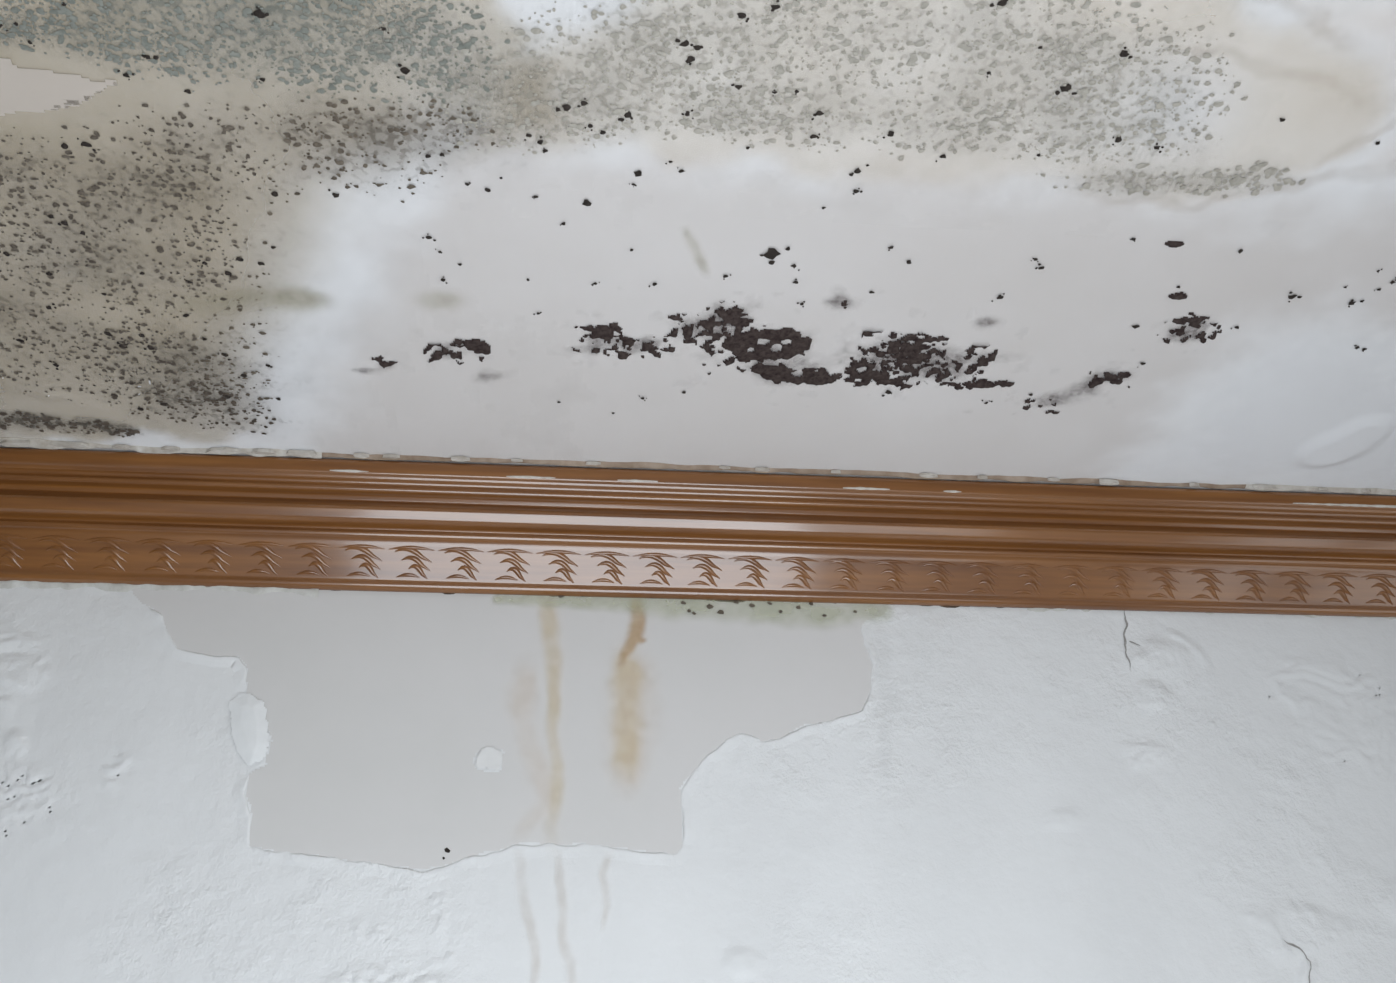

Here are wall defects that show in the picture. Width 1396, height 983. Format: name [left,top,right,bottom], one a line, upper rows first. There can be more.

leakage [0,0,1306,438]
peeling [131,588,888,885]
crack [1123,611,1140,667]